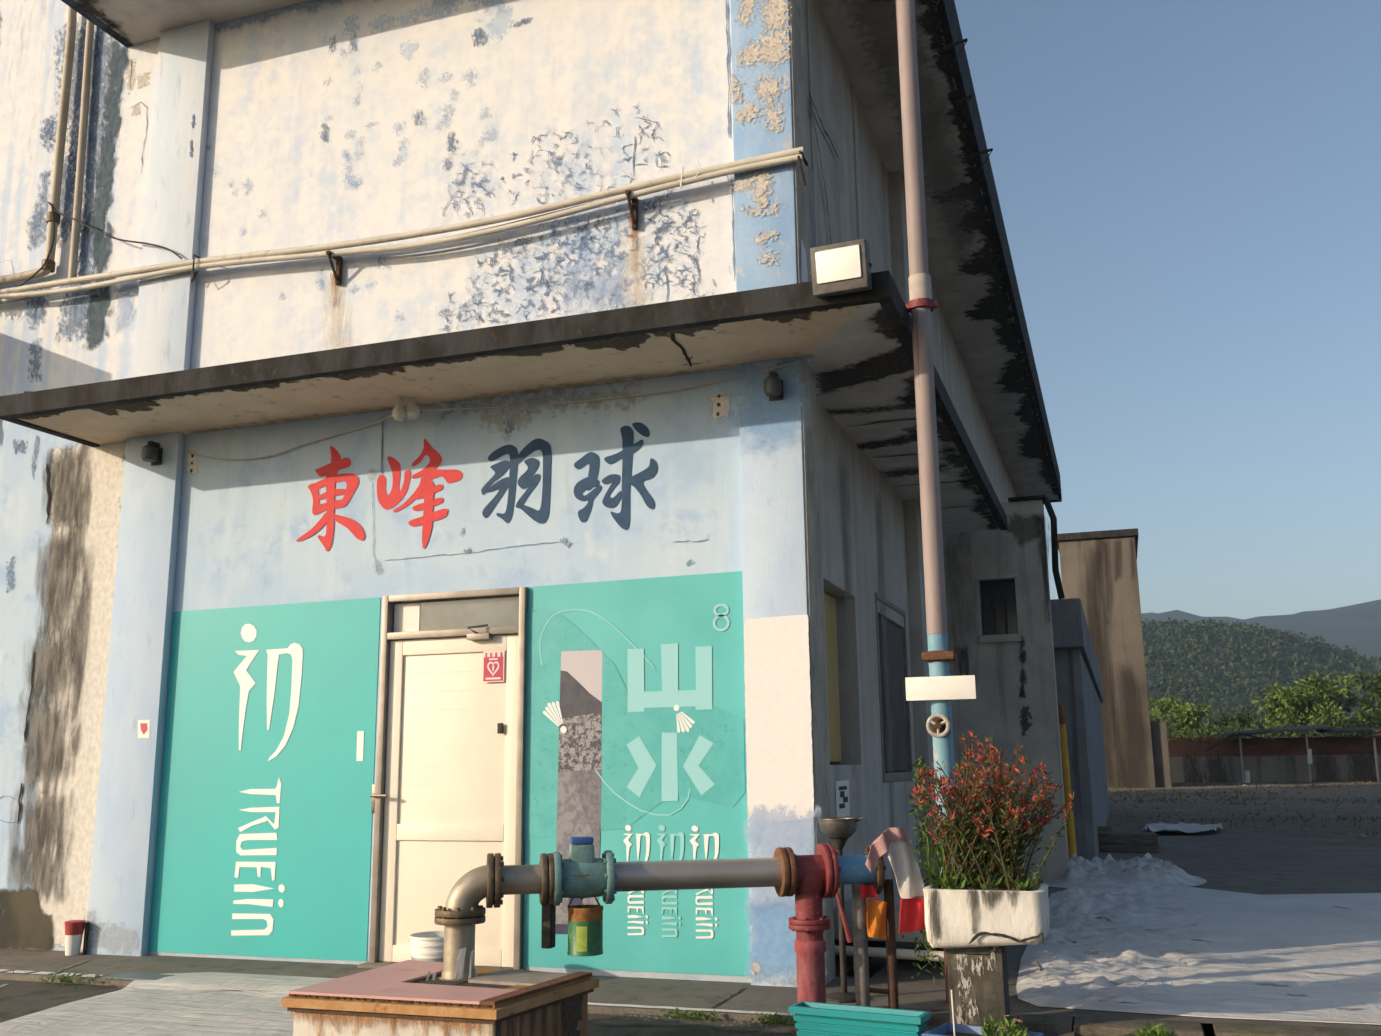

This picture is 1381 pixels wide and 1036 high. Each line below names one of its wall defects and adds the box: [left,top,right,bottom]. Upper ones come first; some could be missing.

peeling [472,28,488,47]
crack [724,0,732,137]
peeling [729,0,792,133]
water stain [73,0,129,350]
peeling [443,133,494,216]
peeling [443,196,695,329]
crack [438,104,736,367]
peeling [729,169,781,266]
water stain [915,0,1060,495]
water stain [738,309,918,450]
water stain [0,444,90,950]
rust [292,995,583,1036]